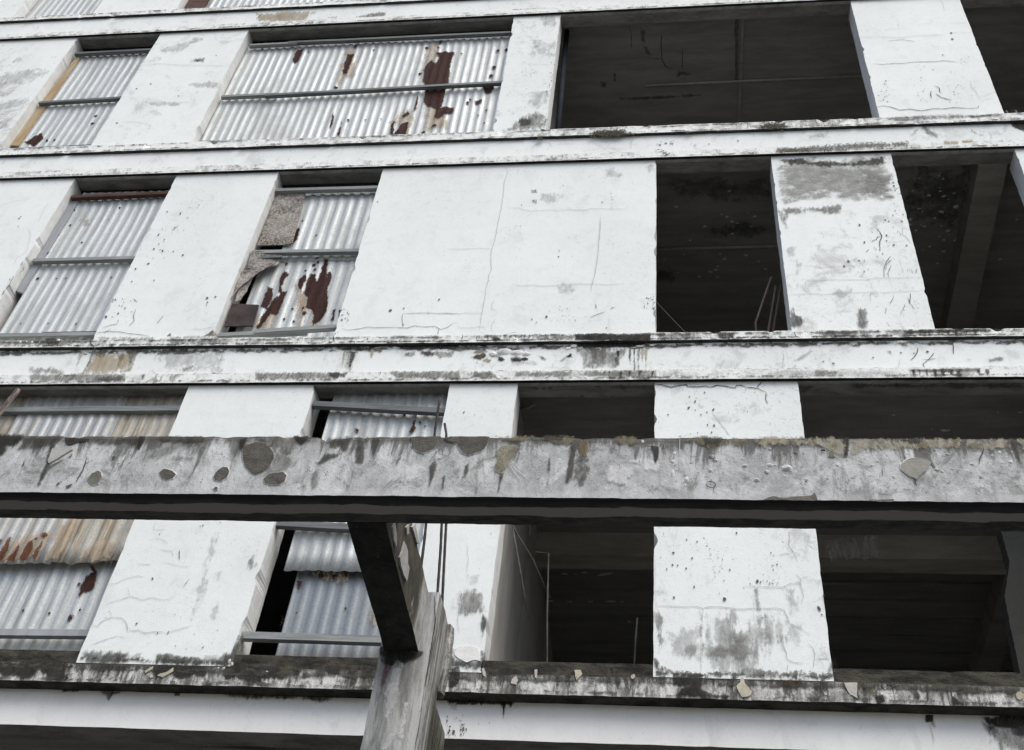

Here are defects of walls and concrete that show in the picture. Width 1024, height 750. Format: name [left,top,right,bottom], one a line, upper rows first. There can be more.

corrosion [390,41,463,135]
damp [674,113,1024,225]
crack [333,140,552,342]
corrosion [255,257,341,329]
damp [0,308,1024,390]
spalling [144,465,178,481]
spalling [202,458,231,492]
spalling [241,442,288,486]
corrosion [77,541,115,596]
crack [91,575,191,645]
damp [0,635,423,749]
damp [448,589,1024,750]